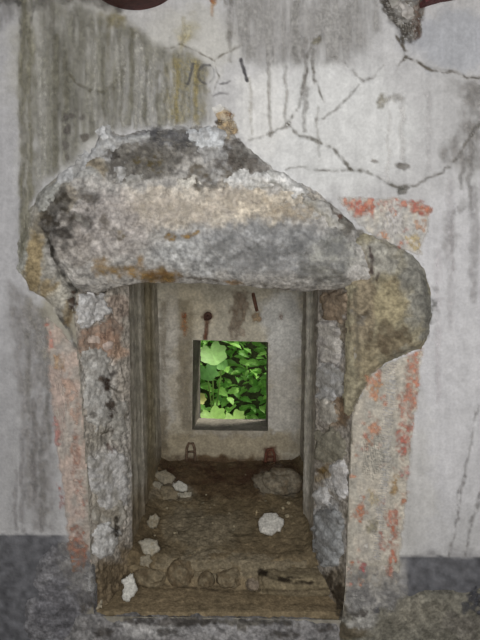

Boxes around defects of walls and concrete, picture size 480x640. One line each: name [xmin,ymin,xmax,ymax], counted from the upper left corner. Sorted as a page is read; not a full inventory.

leakage [308,0,359,61]
crack [396,36,434,71]
leakage [0,0,275,255]
crack [306,137,361,171]
peeling [340,189,431,254]
peeling [311,291,423,617]